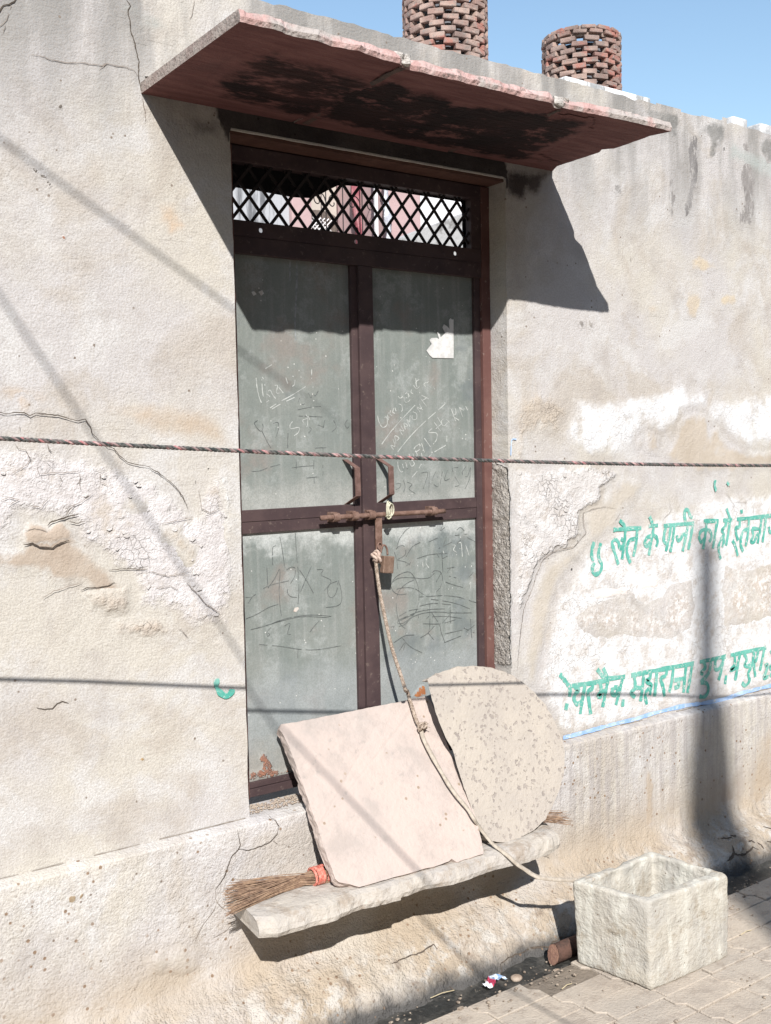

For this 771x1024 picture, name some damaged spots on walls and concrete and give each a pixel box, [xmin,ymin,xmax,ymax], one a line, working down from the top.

crack [31,1,146,121]
water stain [638,103,771,231]
crack [0,412,218,549]
peeling [0,437,242,656]
crack [43,568,218,637]
peeling [492,456,771,740]
rust [249,751,293,782]
crack [195,816,280,941]